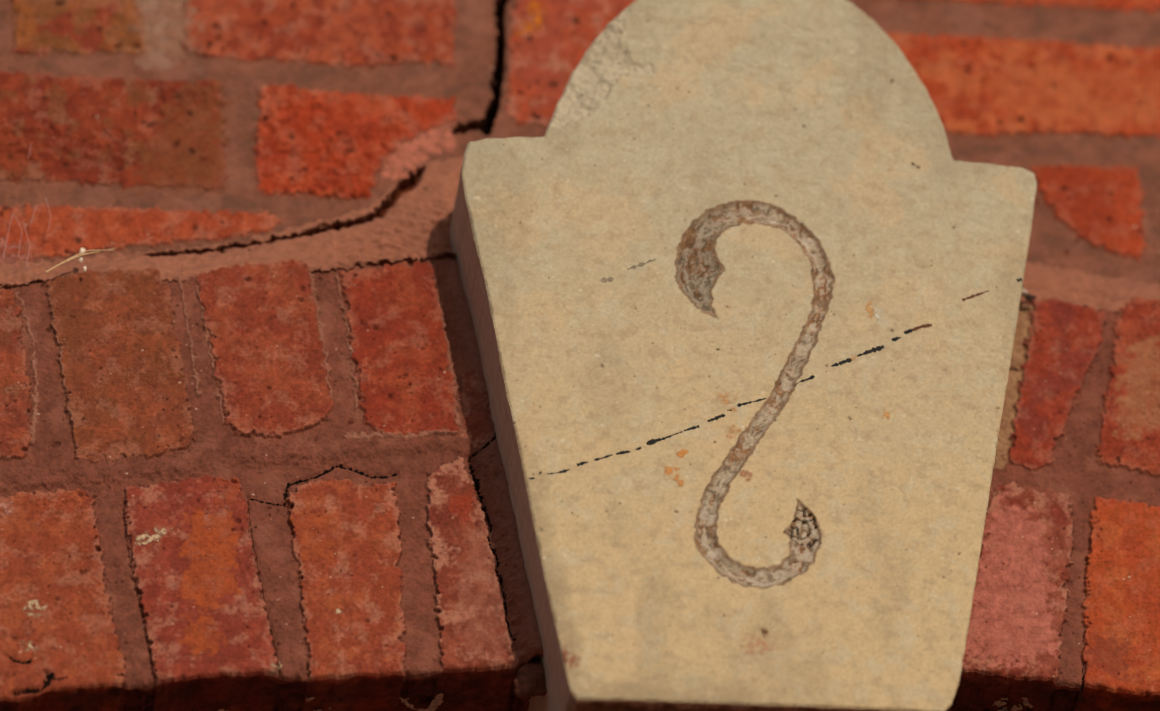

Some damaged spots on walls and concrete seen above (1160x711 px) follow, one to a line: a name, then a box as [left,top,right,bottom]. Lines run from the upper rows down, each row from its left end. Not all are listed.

crack [453,0,507,136]
crack [144,165,426,257]
crack [962,277,1022,301]
crack [795,323,932,386]
crack [528,398,767,479]
crack [247,464,397,681]
crack [468,433,517,641]
peeling [992,697,1033,711]